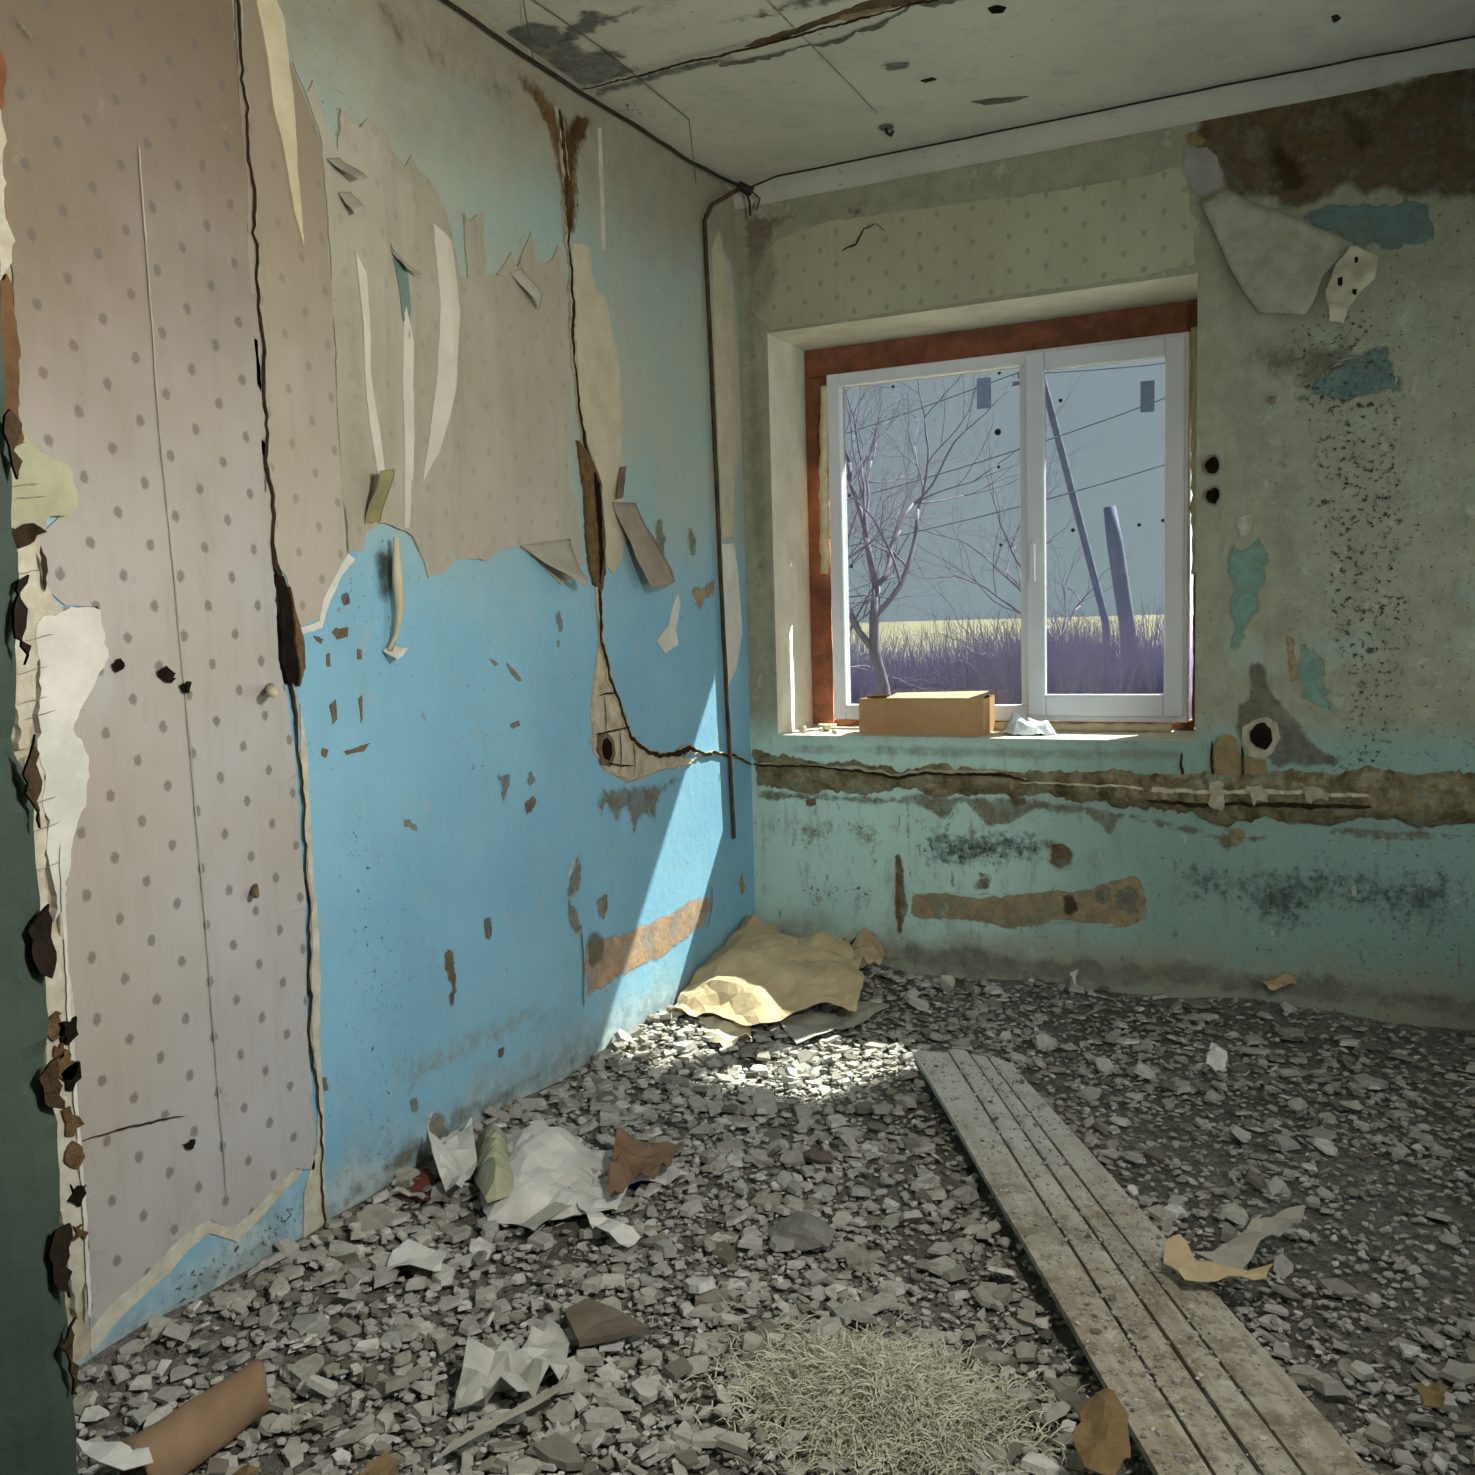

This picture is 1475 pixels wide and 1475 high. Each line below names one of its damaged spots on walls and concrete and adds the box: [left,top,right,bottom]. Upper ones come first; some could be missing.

water stain [507,9,725,116]
peeling [254,0,304,246]
flaking render [1183,132,1224,199]
peeling [1304,200,1434,250]
crack [554,0,961,766]
peeling [1228,515,1270,651]
peeling [313,627,362,667]
flaking render [0,51,109,1395]
crack [1177,752,1185,775]
flaking render [1210,717,1281,775]
peeling [565,852,713,1004]
peeling [907,842,1149,930]